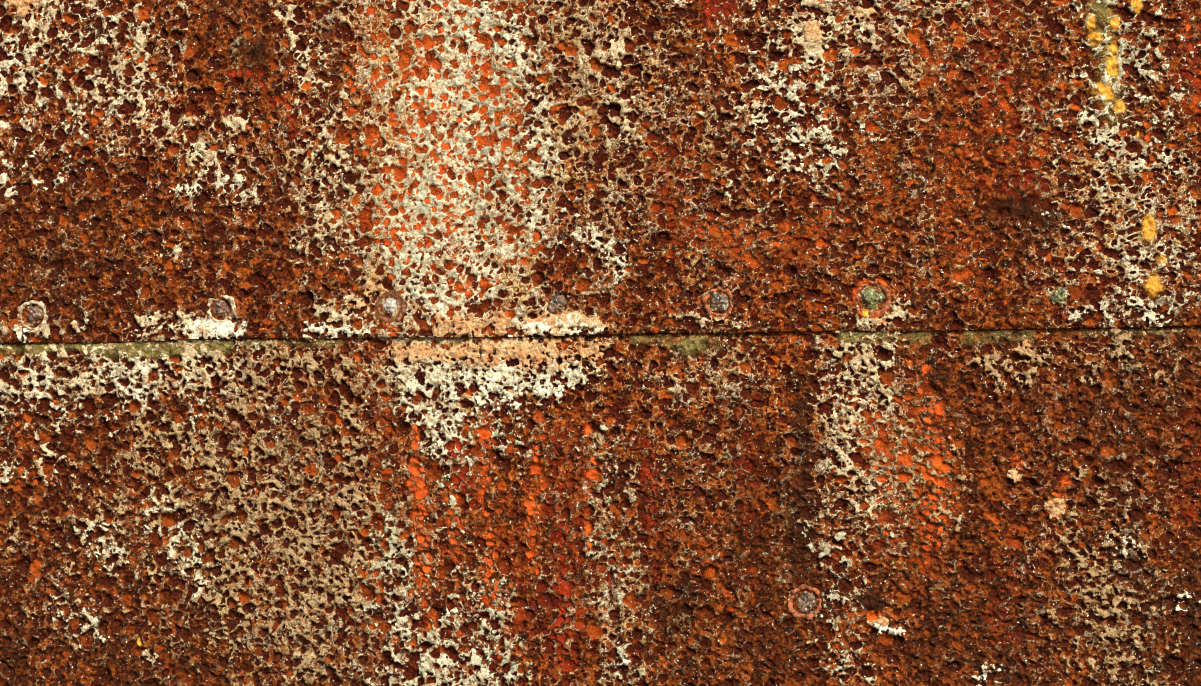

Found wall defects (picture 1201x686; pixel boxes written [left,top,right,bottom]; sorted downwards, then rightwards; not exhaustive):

corrosion [5,0,41,20]
corrosion [701,0,738,37]
corrosion [1173,0,1201,112]
corrosion [976,0,1056,228]
corrosion [332,0,622,379]
corrosion [1012,340,1036,357]
corrosion [407,419,502,653]
corrosion [518,421,597,673]
corrosion [862,363,960,567]
corrosion [1007,455,1023,483]
corrosion [1044,476,1071,521]
corrosion [858,592,910,636]